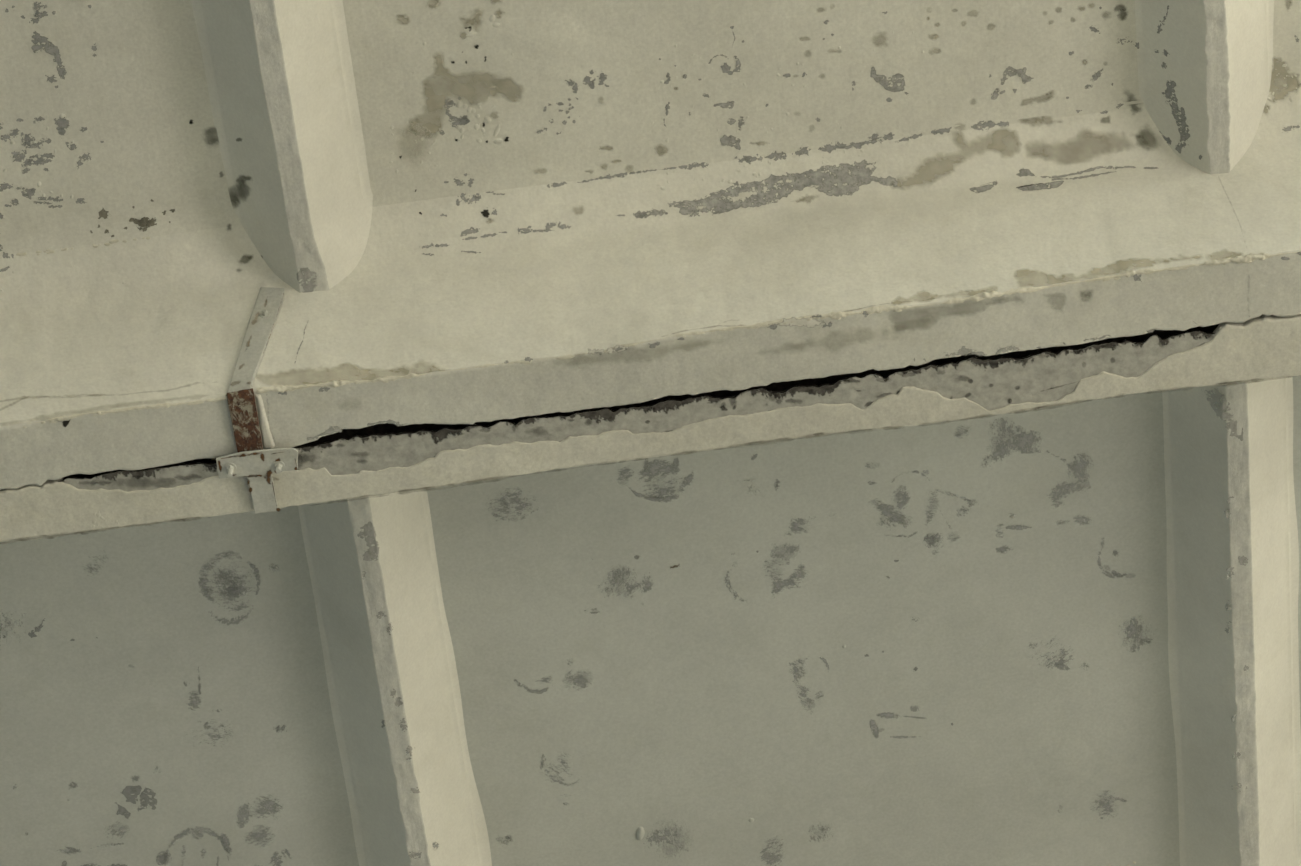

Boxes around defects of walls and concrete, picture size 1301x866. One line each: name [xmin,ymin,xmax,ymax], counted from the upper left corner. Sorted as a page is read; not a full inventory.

peeling [6,2,67,88]
peeling [0,116,91,219]
damp [413,57,520,135]
peeling [536,70,609,135]
peeling [547,162,709,188]
spalling [617,58,952,218]
damp [987,116,1045,152]
peeling [1017,166,1157,191]
peeling [422,223,571,256]
crack [291,323,1232,448]
damp [731,429,871,448]
crack [2,458,216,490]